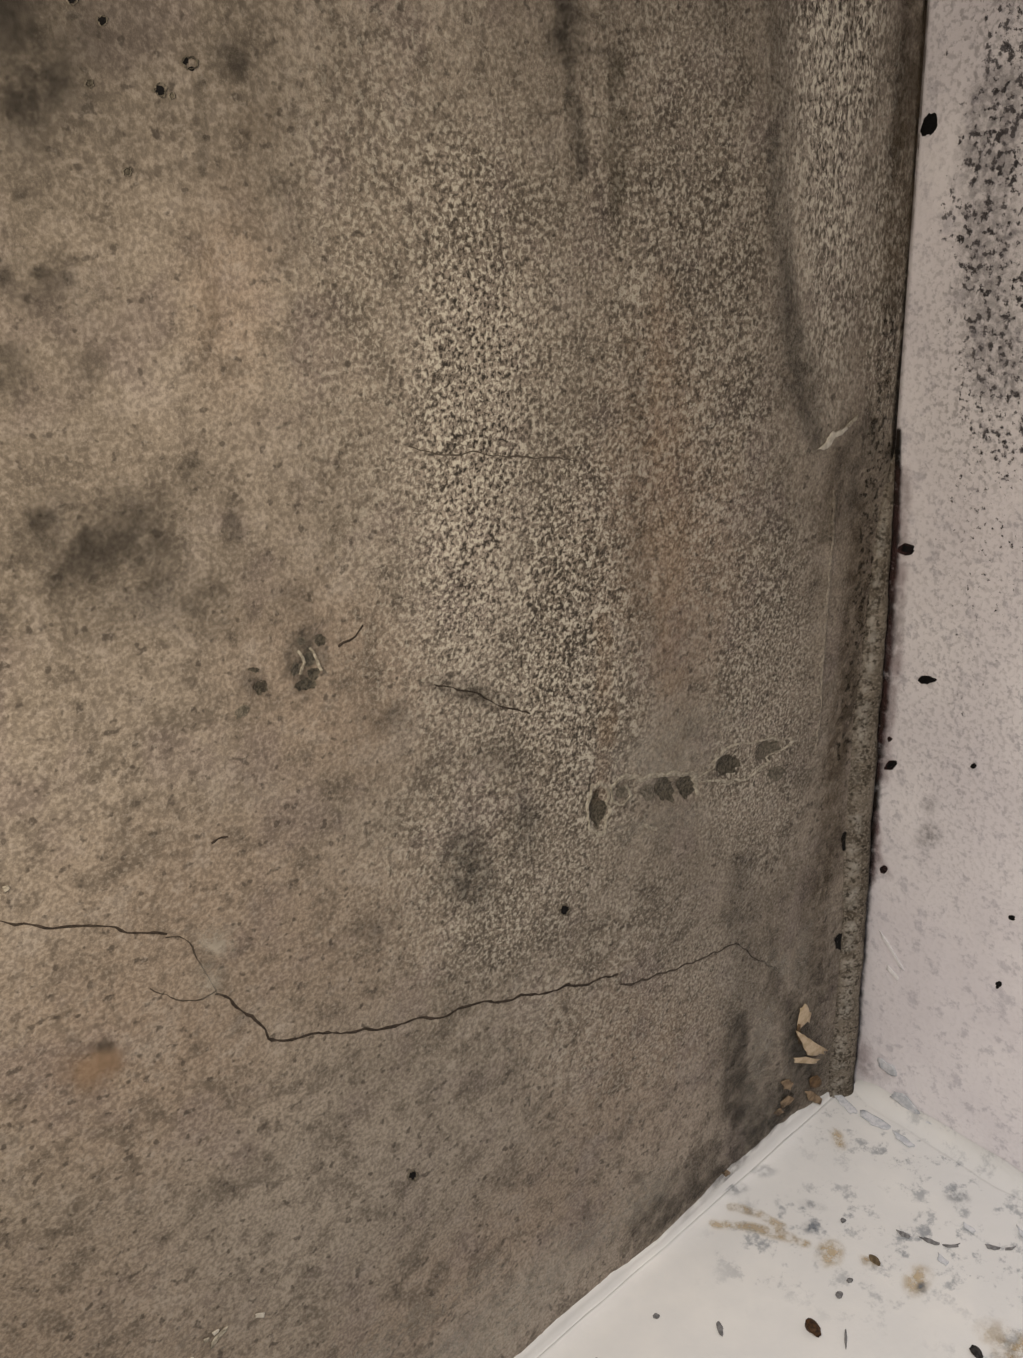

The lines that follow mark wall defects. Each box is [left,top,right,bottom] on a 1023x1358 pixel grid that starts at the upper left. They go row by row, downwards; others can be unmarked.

water stain [940,3,1023,502]
crack [0,920,775,1042]